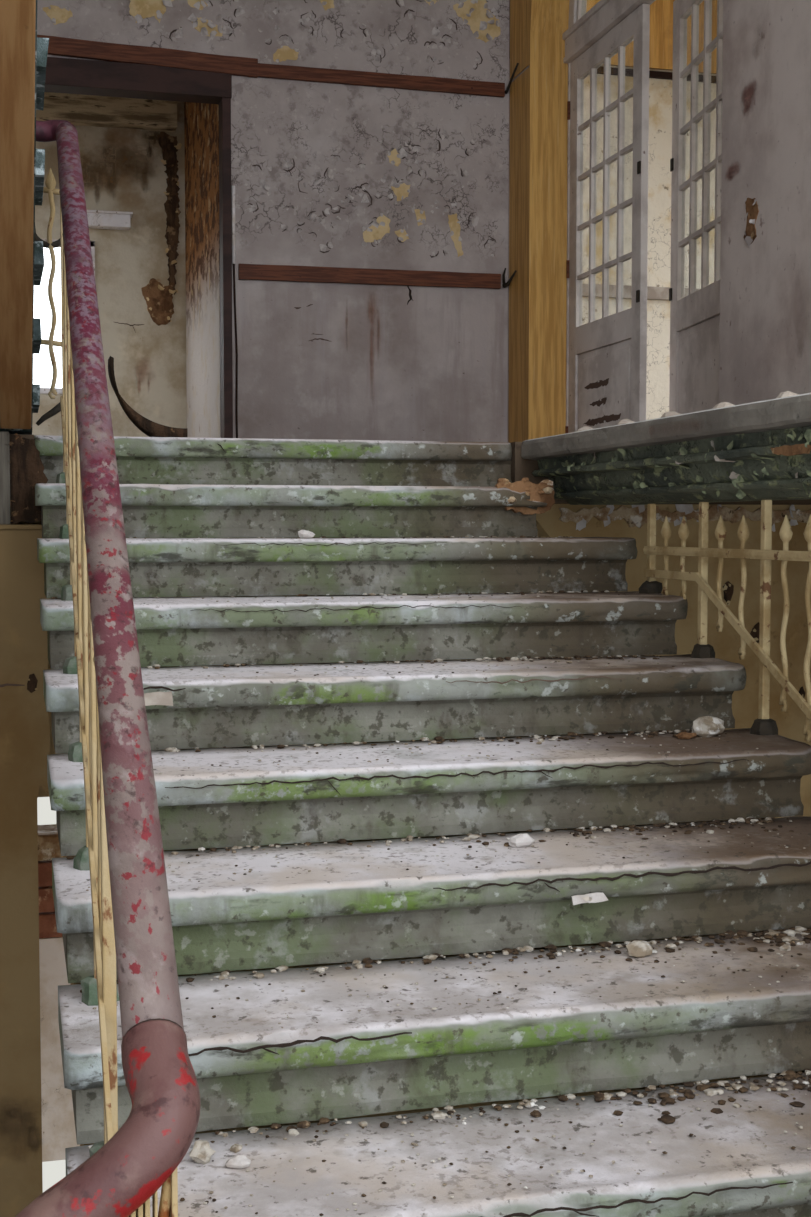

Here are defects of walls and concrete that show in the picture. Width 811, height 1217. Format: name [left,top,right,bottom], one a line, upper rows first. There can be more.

peeling [129,0,245,44]
peeling [258,8,299,63]
peeling [424,0,501,70]
spalling [141,132,182,326]
peeling [243,129,480,258]
spalling [744,196,759,247]
spalling [495,429,811,532]